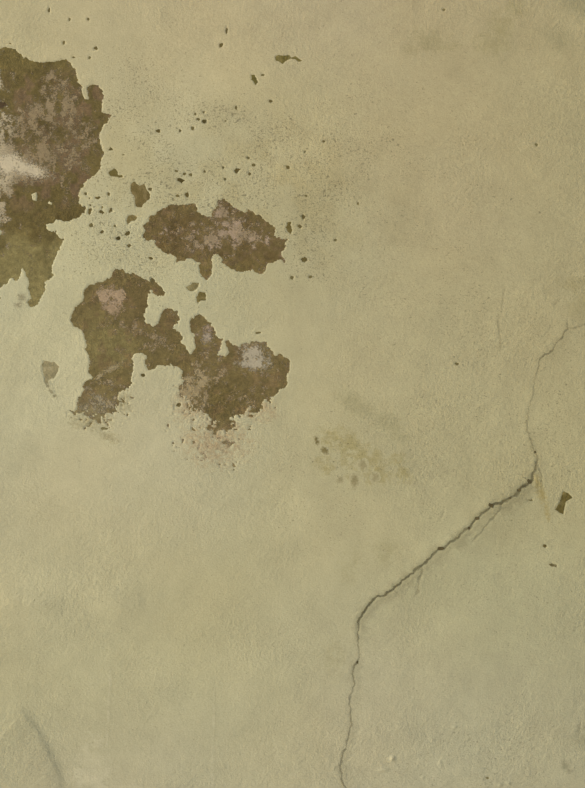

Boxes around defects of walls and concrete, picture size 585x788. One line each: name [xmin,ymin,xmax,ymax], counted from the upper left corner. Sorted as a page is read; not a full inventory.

peeling [275,55,302,64]
peeling [0,43,123,310]
peeling [114,182,305,302]
peeling [57,269,290,479]
crack [468,479,532,529]
peeling [555,491,572,514]
crack [358,547,444,621]